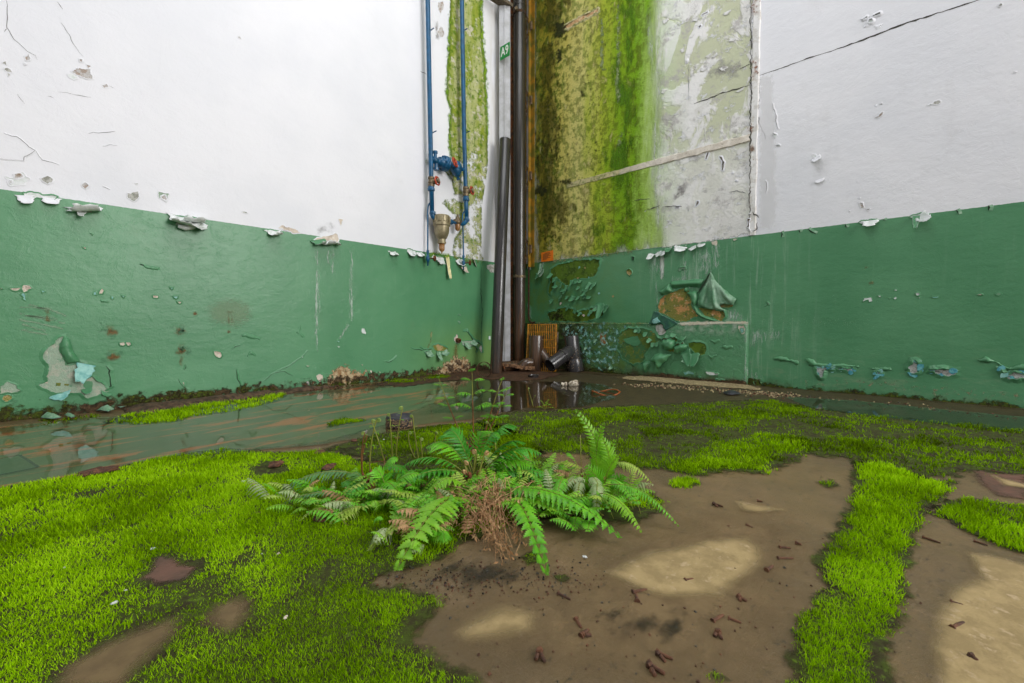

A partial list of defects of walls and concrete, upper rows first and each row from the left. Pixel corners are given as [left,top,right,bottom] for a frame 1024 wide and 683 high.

mould [554,21,566,63]
crack [688,0,977,237]
crack [0,132,60,165]
peeling [8,172,103,216]
peeling [157,190,208,231]
peeling [262,218,344,245]
peeling [909,210,931,228]
peeling [527,257,748,381]
peeling [420,328,491,361]
peeling [35,334,115,401]
peeling [774,356,961,381]
peeling [0,356,461,488]